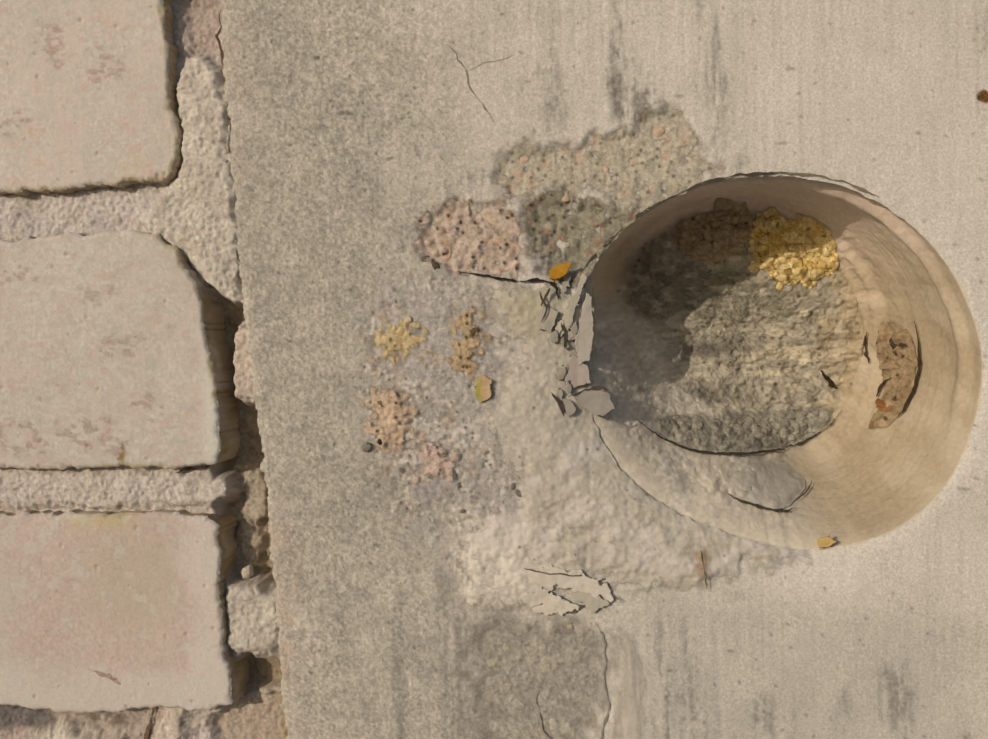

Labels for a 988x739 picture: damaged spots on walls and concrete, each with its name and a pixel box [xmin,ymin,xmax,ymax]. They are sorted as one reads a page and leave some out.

crack [446,44,512,122]
rust [977,90,988,103]
spalling [355,105,725,564]